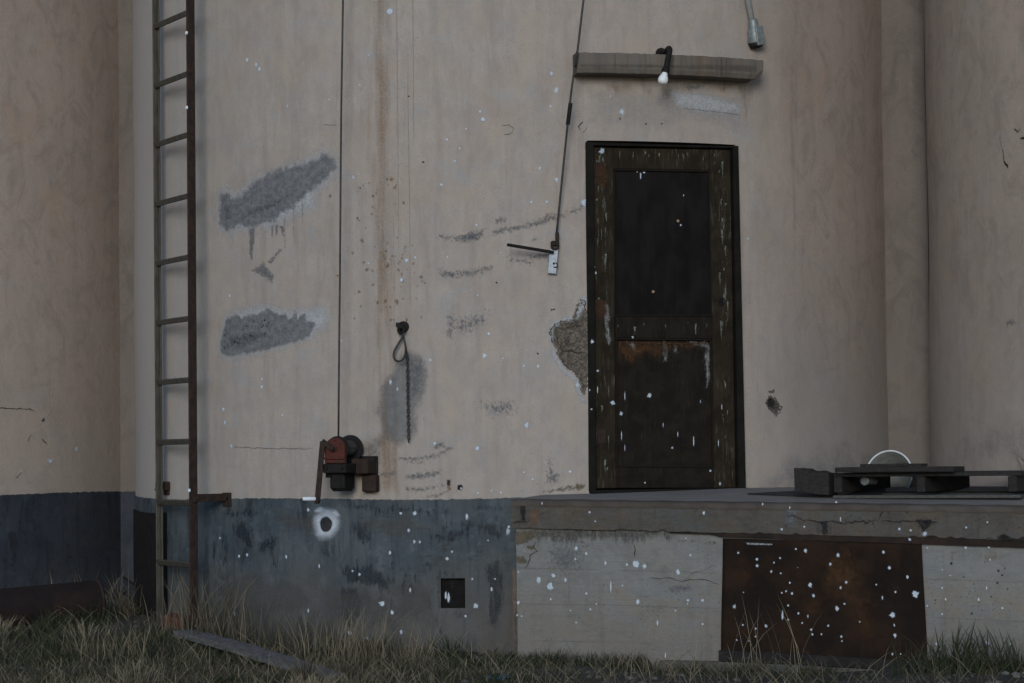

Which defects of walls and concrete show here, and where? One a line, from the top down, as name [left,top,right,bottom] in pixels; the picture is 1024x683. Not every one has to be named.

flaking render [549,297,625,415]
water stain [380,355,424,441]
spalling [765,389,783,417]
crack [785,506,936,528]
crack [521,544,721,609]
corrosion [827,558,865,622]